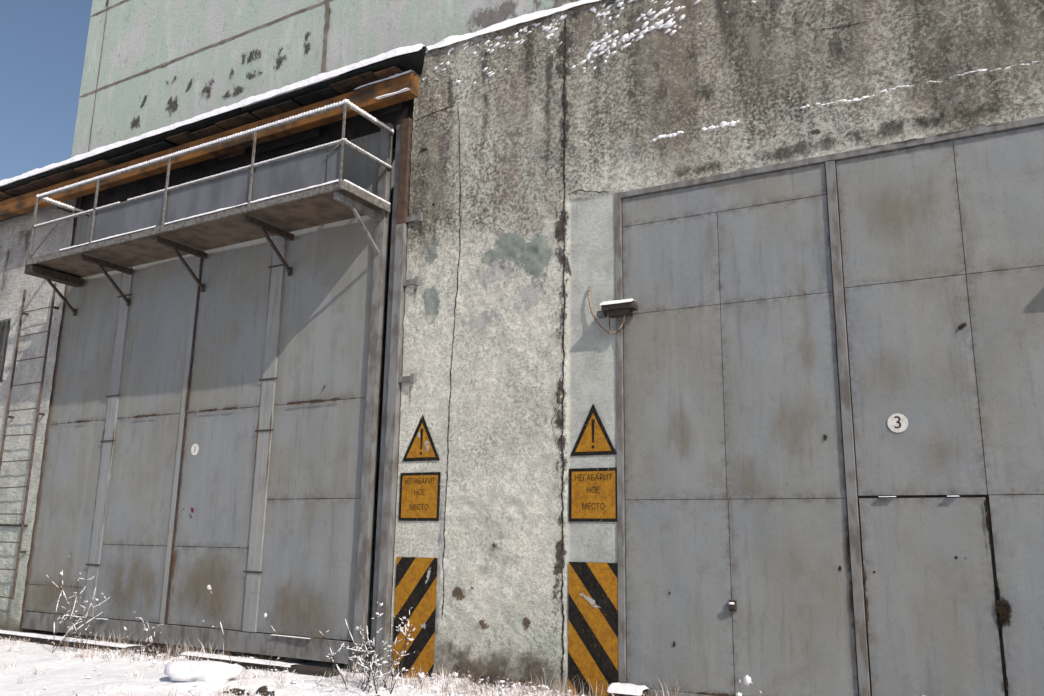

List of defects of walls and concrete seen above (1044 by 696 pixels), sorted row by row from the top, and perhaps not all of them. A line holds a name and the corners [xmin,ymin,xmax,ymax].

peeling [130,93,148,130]
peeling [164,47,287,114]
damp [546,27,573,173]
damp [767,137,830,159]
damp [877,120,904,138]
damp [554,211,571,353]
crack [415,104,461,615]
crack [551,14,610,686]
damp [554,370,568,488]
damp [552,510,566,615]
rust [984,500,992,551]